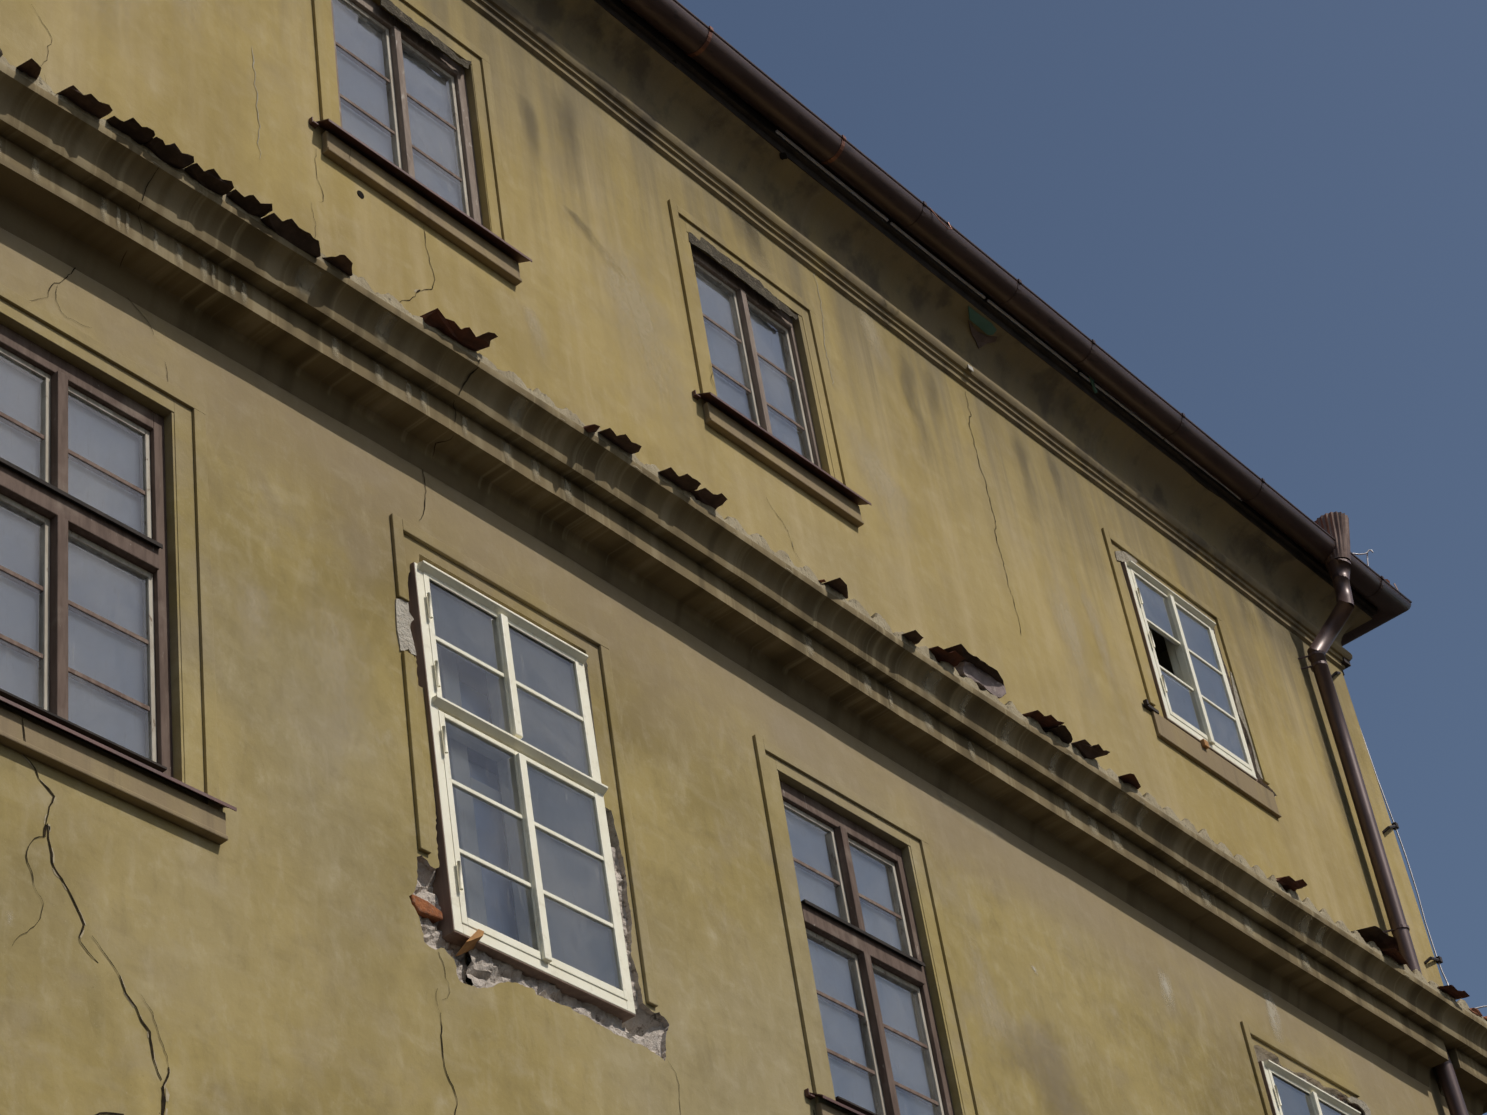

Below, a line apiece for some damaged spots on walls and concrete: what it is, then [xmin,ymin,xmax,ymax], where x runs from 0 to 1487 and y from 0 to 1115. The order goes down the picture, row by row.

flaking render [395,599,416,656]
crack [12,718,170,1115]
flaking render [409,847,665,1058]
crack [436,954,458,1114]
flaking render [1295,1073,1371,1115]